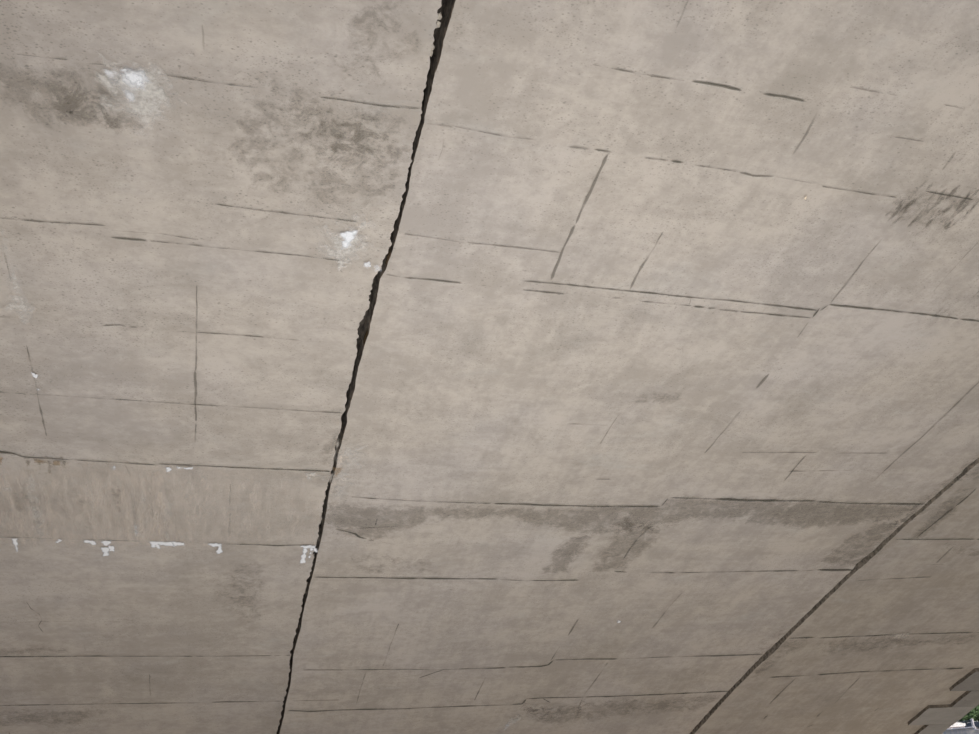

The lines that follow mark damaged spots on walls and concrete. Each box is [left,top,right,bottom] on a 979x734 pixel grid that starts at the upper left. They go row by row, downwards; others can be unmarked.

leakage [99,69,167,123]
crack [0,0,459,734]
crack [526,281,979,322]
crack [406,458,979,734]